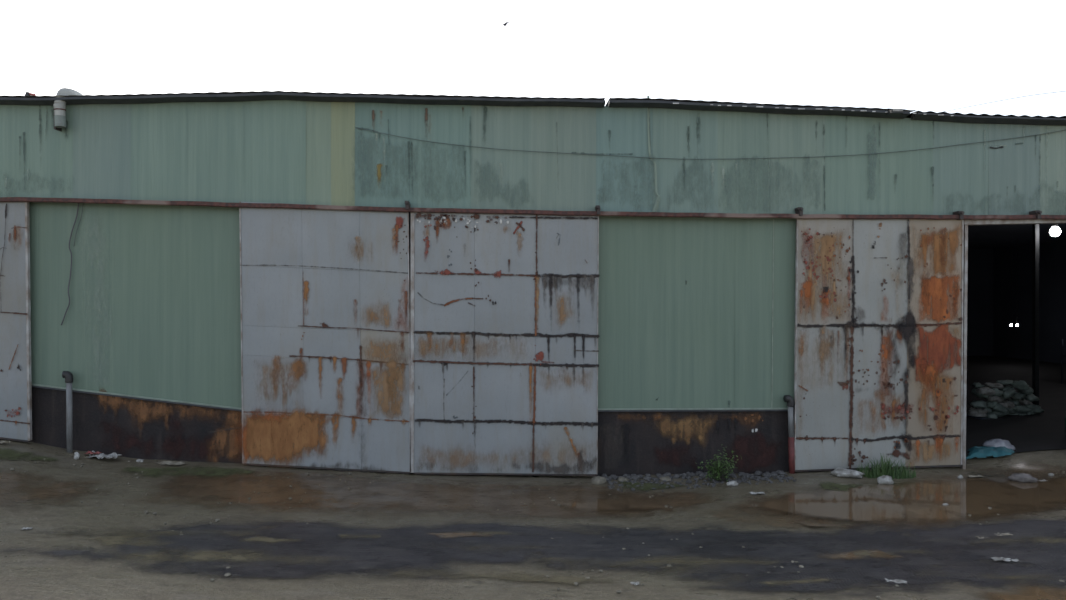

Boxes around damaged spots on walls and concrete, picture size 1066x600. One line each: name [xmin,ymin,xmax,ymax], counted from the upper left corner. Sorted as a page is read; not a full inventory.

corrosion [98,390,214,422]
corrosion [208,215,600,474]
corrosion [644,414,758,443]
corrosion [796,219,962,469]